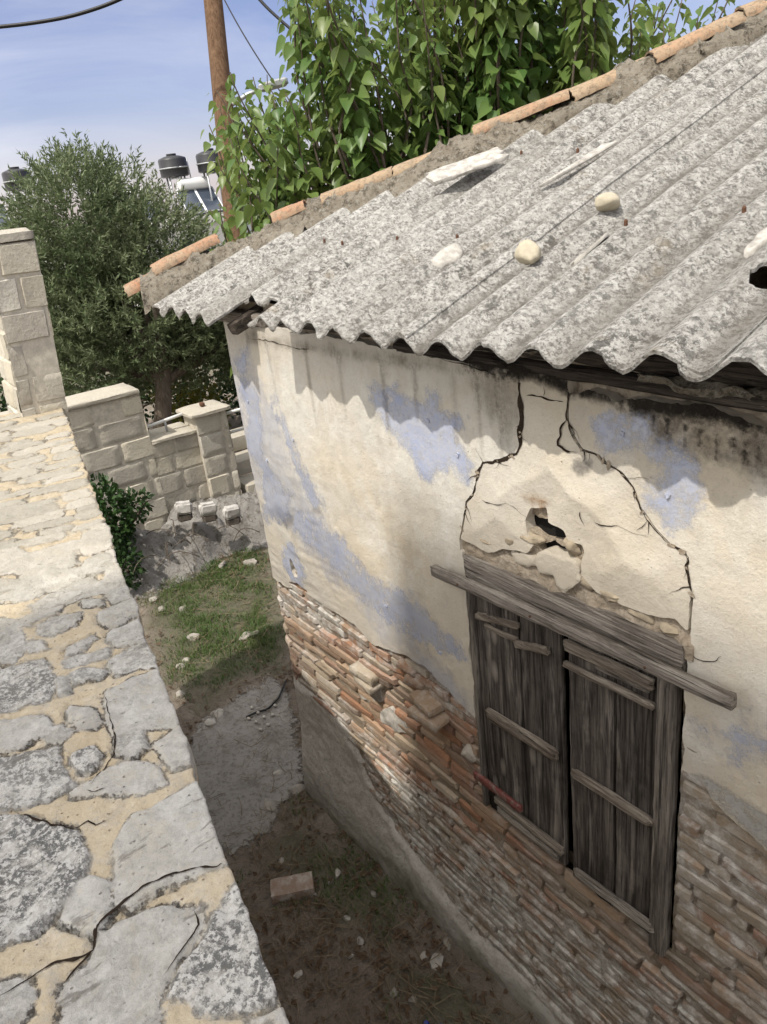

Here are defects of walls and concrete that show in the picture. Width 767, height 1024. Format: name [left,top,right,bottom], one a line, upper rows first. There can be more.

crack [428,356,695,604]
damp [464,357,767,476]
spalling [462,507,694,662]
flaking render [277,542,767,1024]
crack [1,856,232,995]